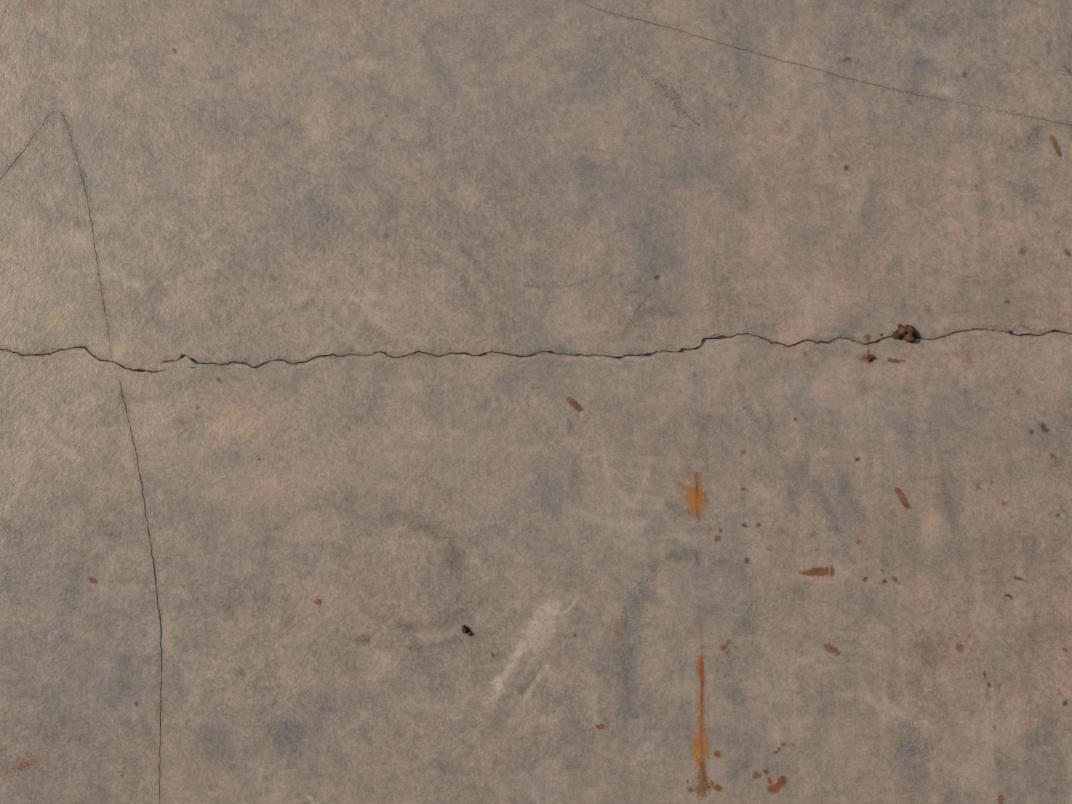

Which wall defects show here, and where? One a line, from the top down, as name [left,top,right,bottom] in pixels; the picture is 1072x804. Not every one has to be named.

crack [586,4,1072,126]
crack [916,324,1072,345]
rust [565,397,584,412]
crack [0,112,907,804]
rust [675,470,710,523]
rust [894,488,911,509]
rust [787,565,835,577]
rust [687,622,728,801]